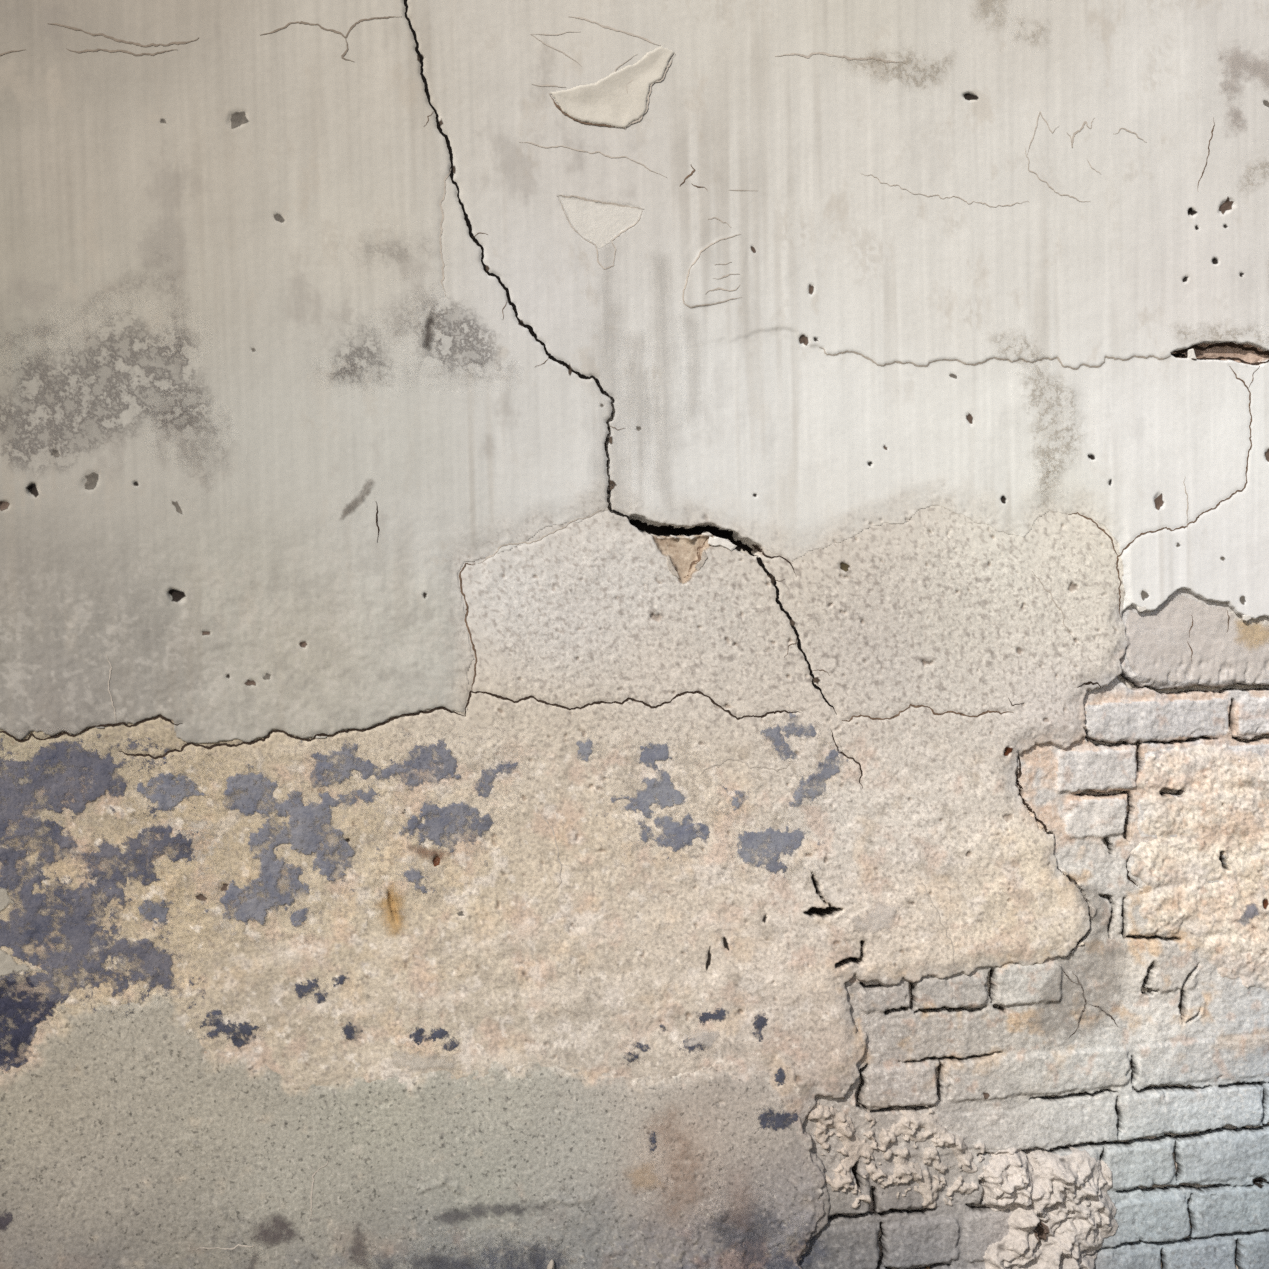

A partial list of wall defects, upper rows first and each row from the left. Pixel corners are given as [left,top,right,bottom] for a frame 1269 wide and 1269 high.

crack [820,347,1171,370]
crack [0,0,1024,788]
crack [1068,366,1260,621]
spalling [652,535,736,584]
peeling [595,739,770,861]
peeling [736,825,804,878]
peeling [0,732,522,1072]
rust [382,889,401,930]
flaking render [758,588,1269,1269]
peeling [697,1008,728,1025]
water stain [256,1217,295,1243]
water stain [442,1205,543,1222]